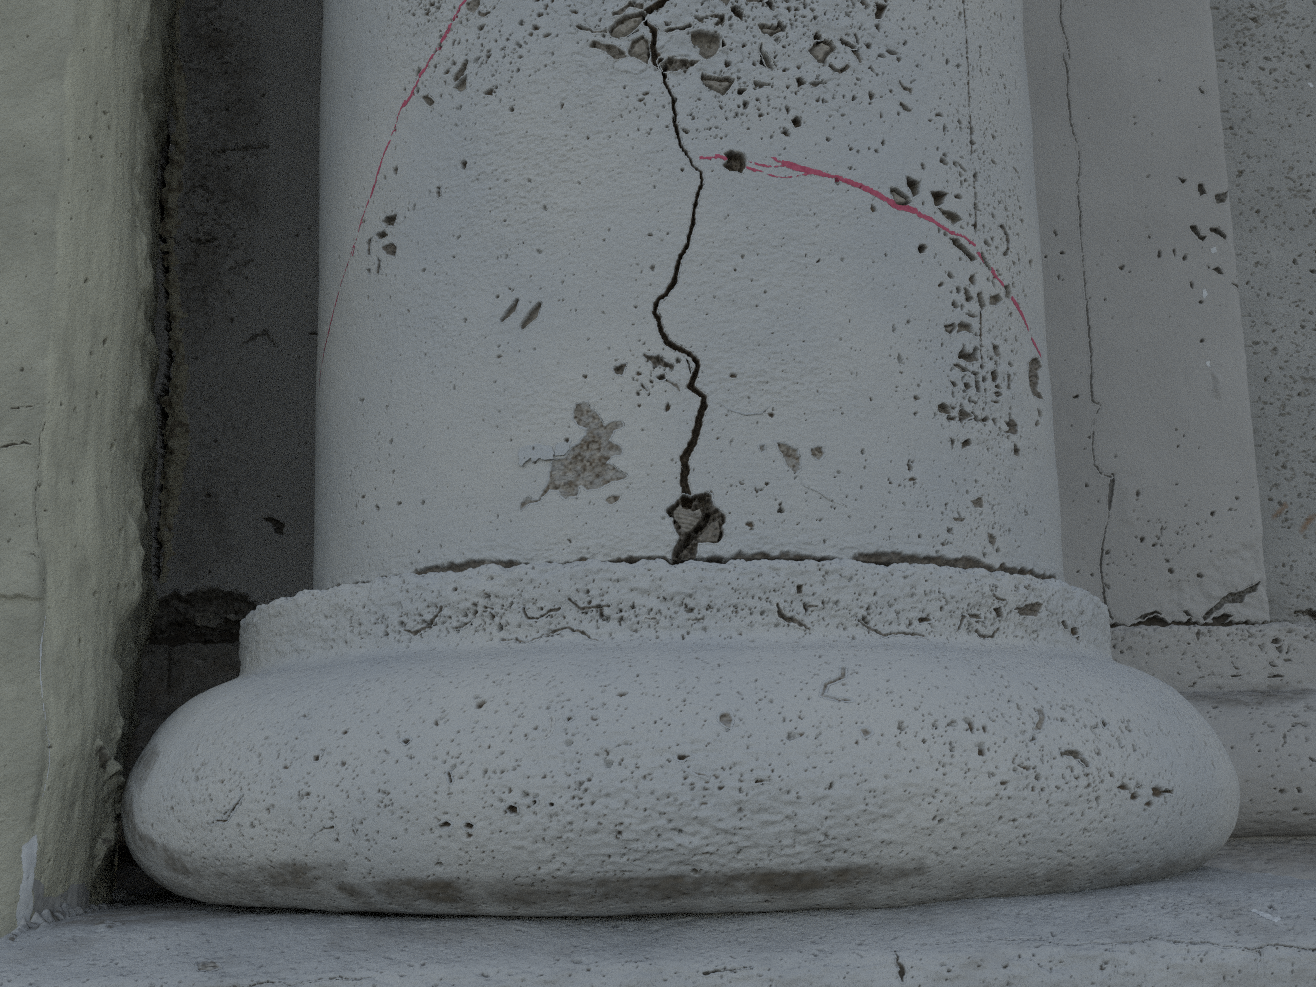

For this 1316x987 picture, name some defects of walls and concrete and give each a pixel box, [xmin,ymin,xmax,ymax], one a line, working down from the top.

spalling [420,93,436,108]
spalling [451,59,469,94]
spalling [365,213,398,279]
crack [641,0,710,496]
spalling [498,297,542,331]
crack [1058,0,1116,622]
spalling [611,362,628,376]
spalling [639,353,682,394]
peeling [518,400,628,512]
peeling [757,440,846,507]
spalling [665,490,729,562]
spalling [150,586,258,639]